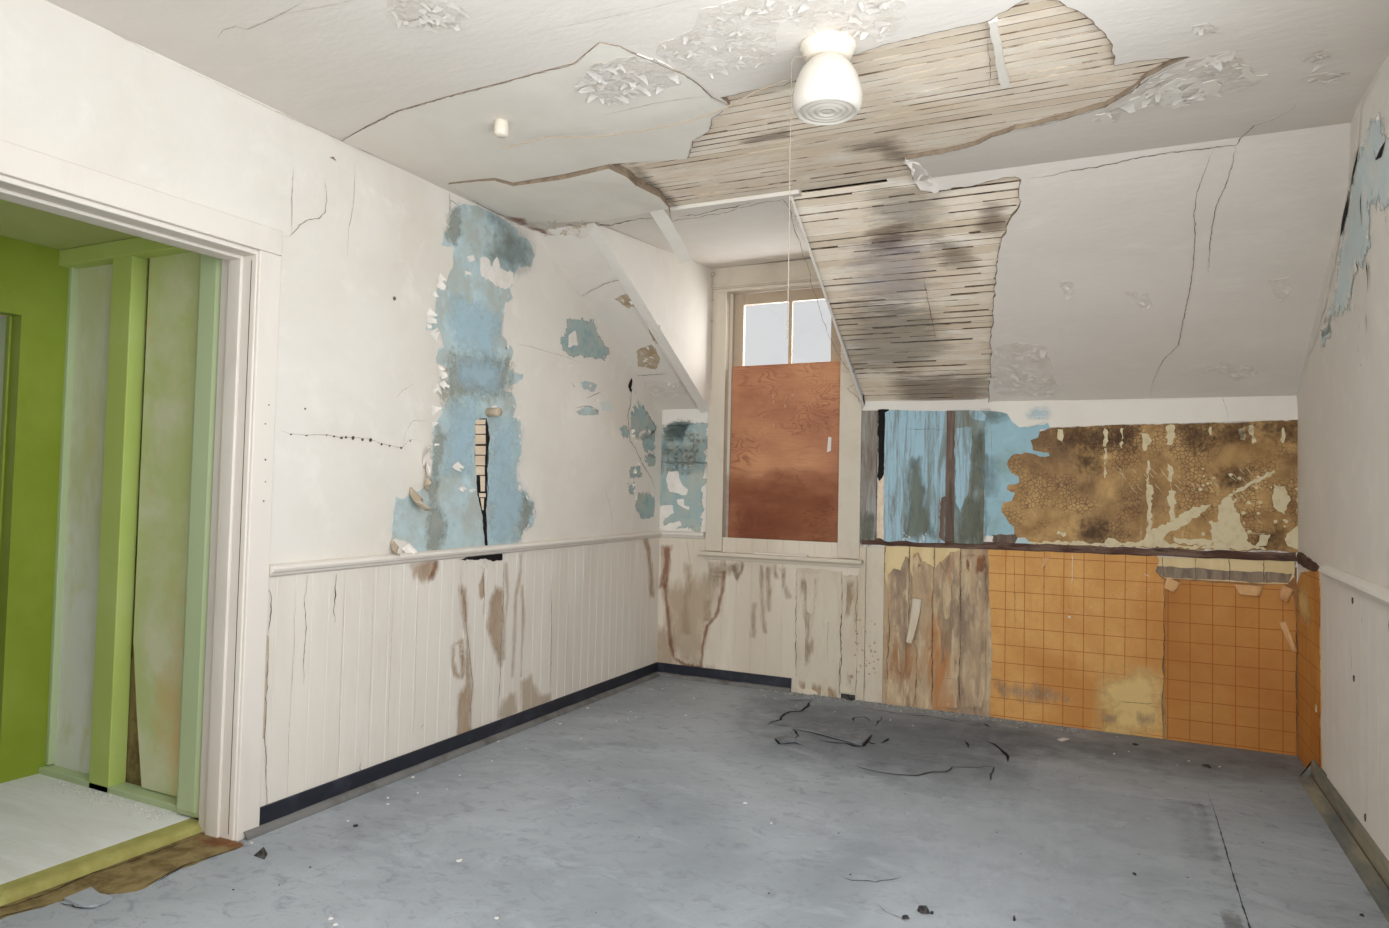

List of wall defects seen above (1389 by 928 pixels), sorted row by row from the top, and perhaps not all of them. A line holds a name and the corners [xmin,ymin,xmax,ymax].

peeling [386,0,470,33]
crack [283,387,418,449]
peeling [391,204,593,569]
peeling [561,318,609,415]
flaking render [574,0,1268,544]
crack [1039,120,1272,380]
peeling [1320,114,1389,351]
water stain [454,559,504,734]